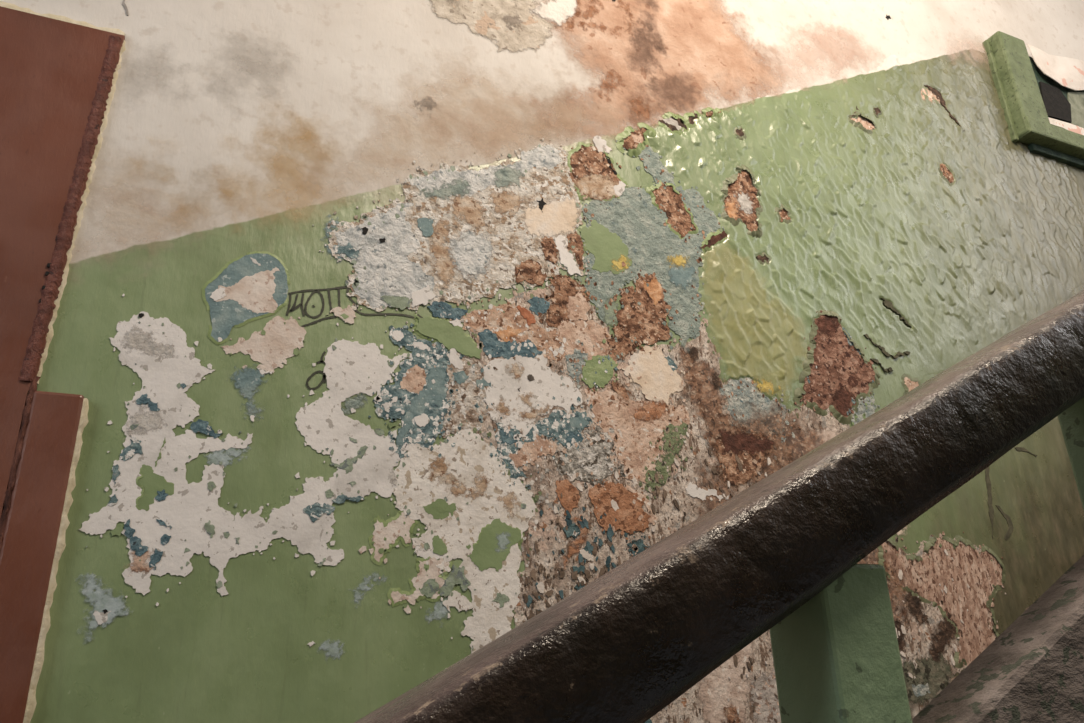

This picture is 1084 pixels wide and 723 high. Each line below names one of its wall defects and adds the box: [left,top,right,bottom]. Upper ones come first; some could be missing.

spalling [430,0,580,53]
leakage [347,0,791,181]
peeling [938,162,954,187]
peeling [79,106,882,654]
peeling [901,373,921,395]
spalling [857,527,1006,719]
spalling [645,630,781,723]